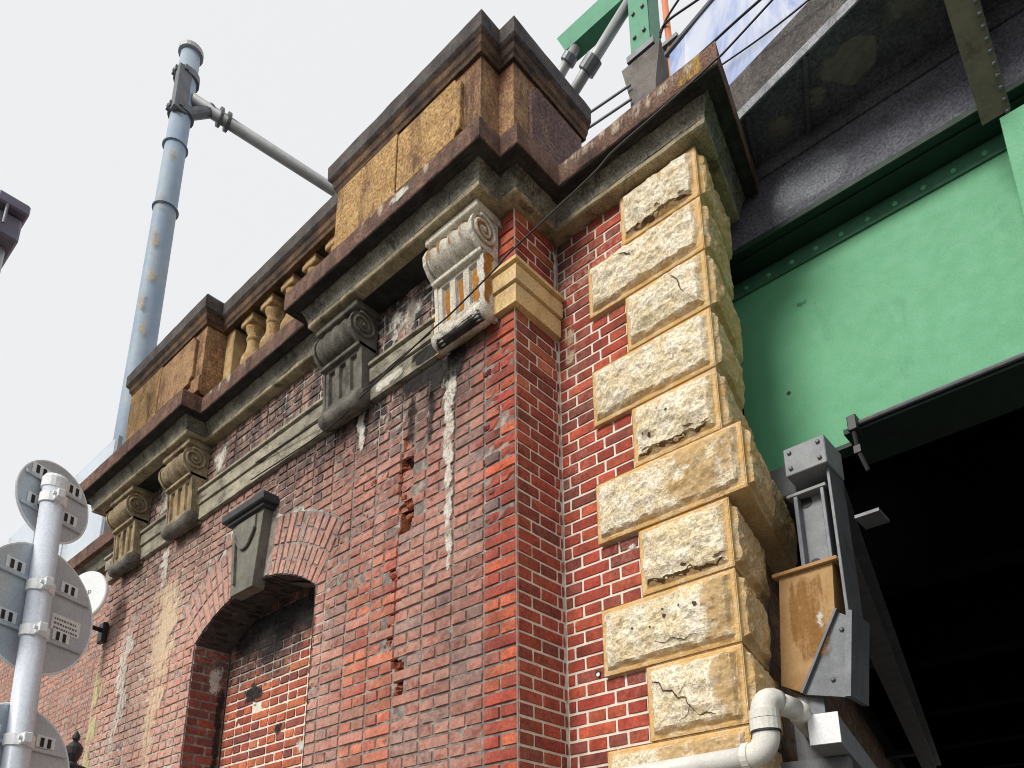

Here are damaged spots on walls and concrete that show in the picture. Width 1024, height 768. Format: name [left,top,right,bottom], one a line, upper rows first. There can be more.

spalling [626,189,692,234]
corrosion [427,214,493,321]
water stain [357,411,366,449]
spalling [639,417,710,457]
water stain [407,356,457,569]
spalling [362,463,414,524]
spalling [647,551,725,585]
corrosion [789,578,828,659]
spalling [395,662,404,695]
crack [652,674,715,721]